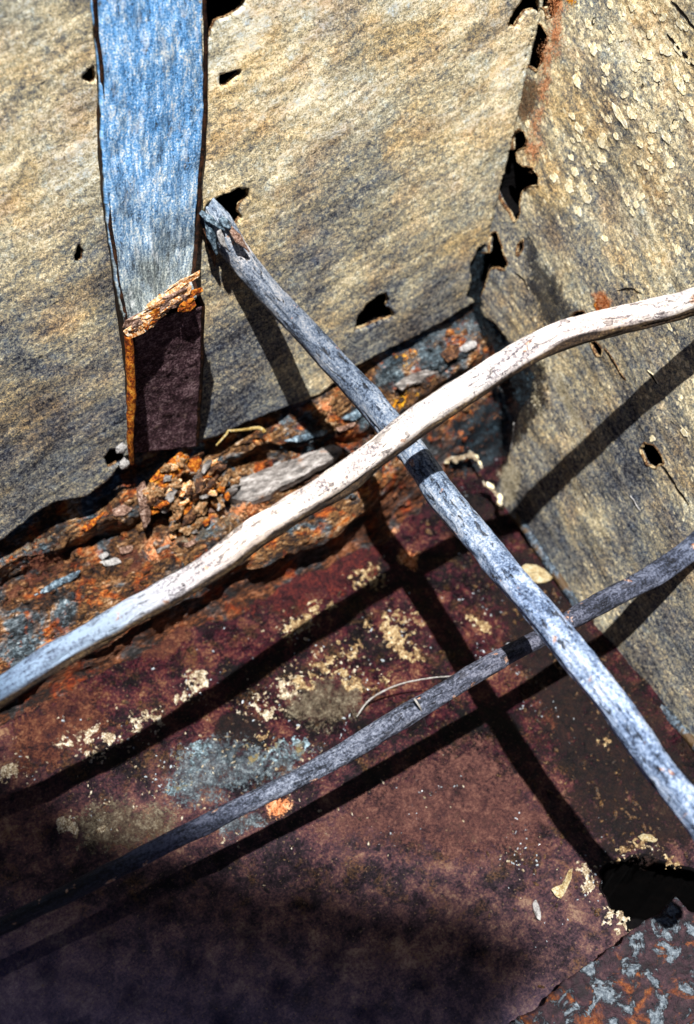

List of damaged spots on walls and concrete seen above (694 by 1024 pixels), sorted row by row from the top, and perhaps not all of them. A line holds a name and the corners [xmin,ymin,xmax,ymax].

rust [518,0,576,164]
spalling [216,188,246,221]
spalling [356,293,391,326]
spalling [643,435,663,466]
rust [0,198,694,936]
spalling [575,838,694,936]